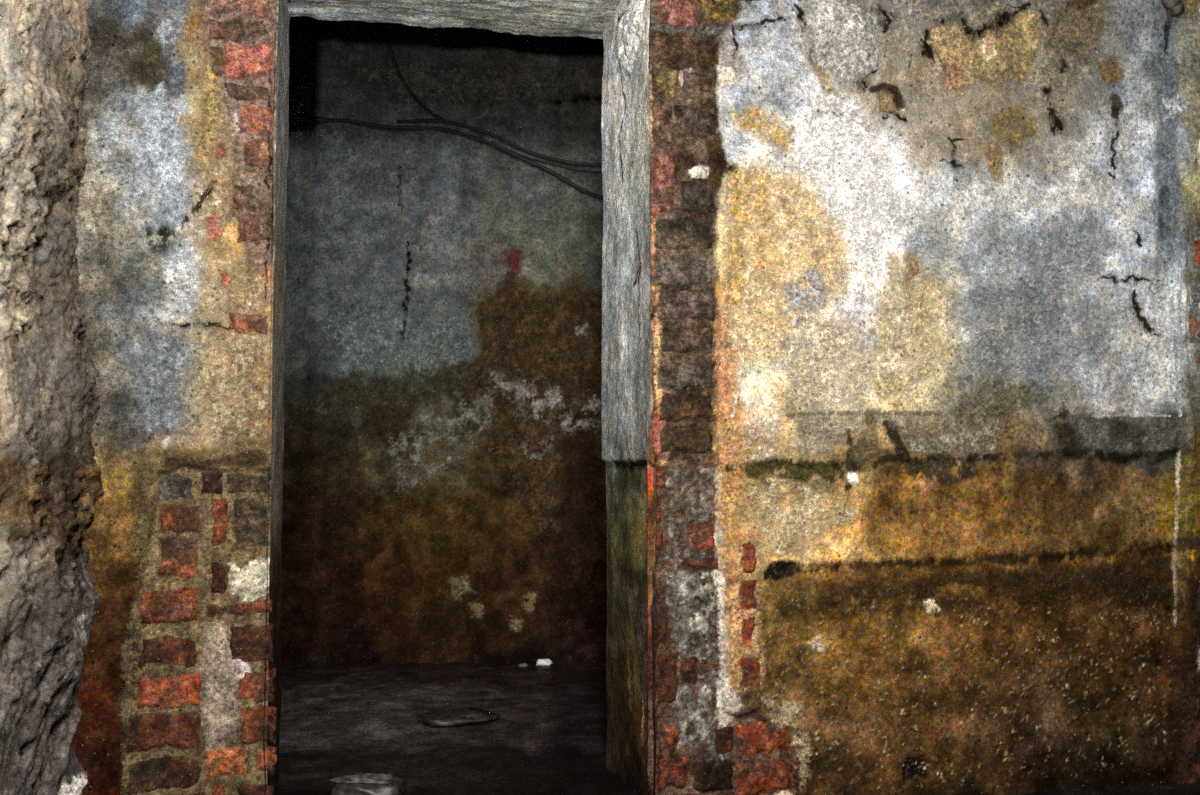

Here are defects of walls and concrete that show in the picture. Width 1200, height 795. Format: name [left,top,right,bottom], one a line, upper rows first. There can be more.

peeling [929,0,1104,95]
crack [1107,107,1120,178]
flaking render [185,0,278,447]
crack [1133,230,1142,247]
crack [400,241,412,340]
crack [1101,275,1162,336]
water stain [302,272,655,610]
flaking render [636,0,939,795]
water stain [714,202,1196,727]
flaking render [119,465,277,795]
water stain [510,592,536,632]
water stain [761,696,837,795]